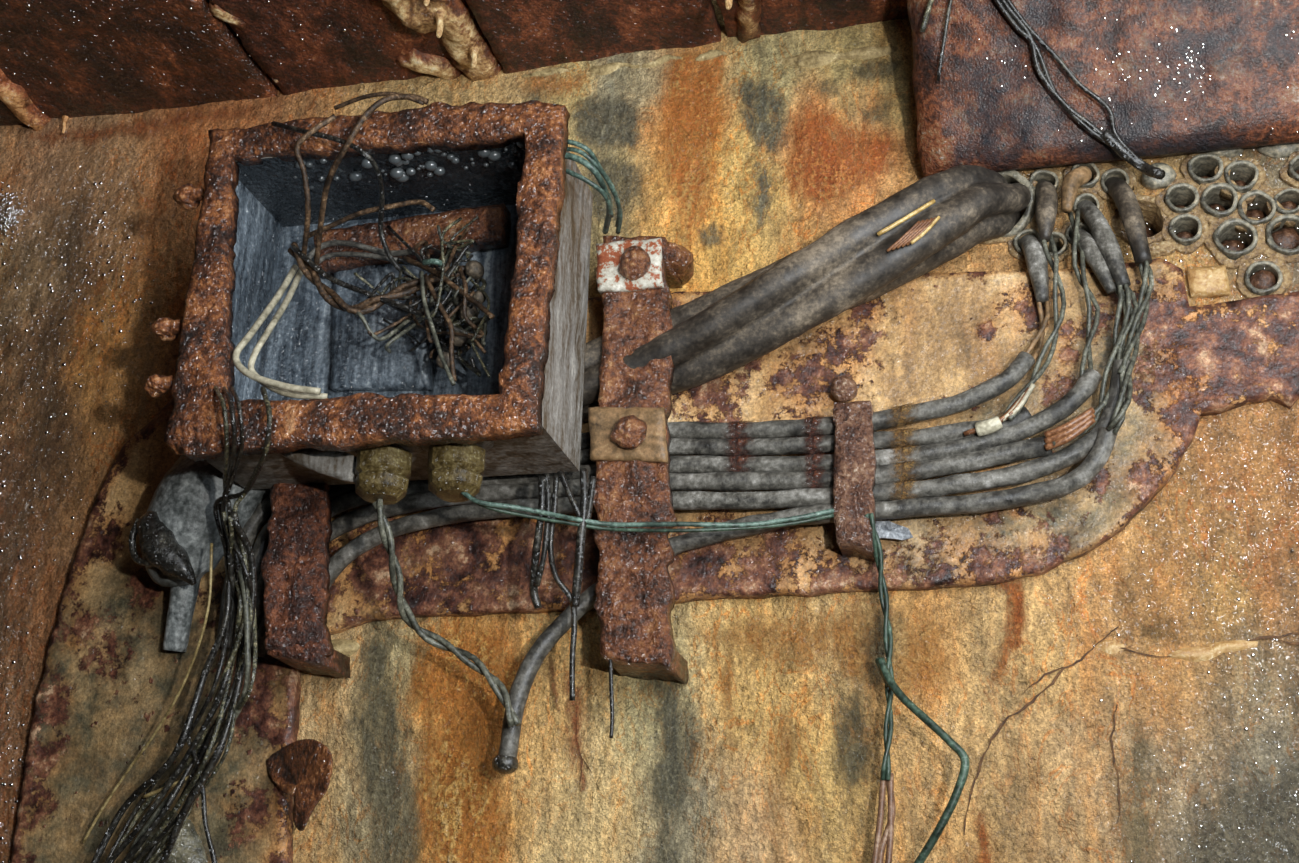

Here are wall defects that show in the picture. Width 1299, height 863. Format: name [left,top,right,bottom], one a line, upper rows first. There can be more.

damp [521,50,727,79]
damp [574,96,638,219]
corrosion [668,55,723,244]
damp [740,83,786,149]
damp [754,165,772,227]
corrosion [791,111,890,204]
corrosion [727,421,752,472]
corrosion [892,403,917,499]
corrosion [996,581,1023,678]
crack [1246,632,1299,645]
crack [964,627,1173,835]
damp [1179,778,1299,863]